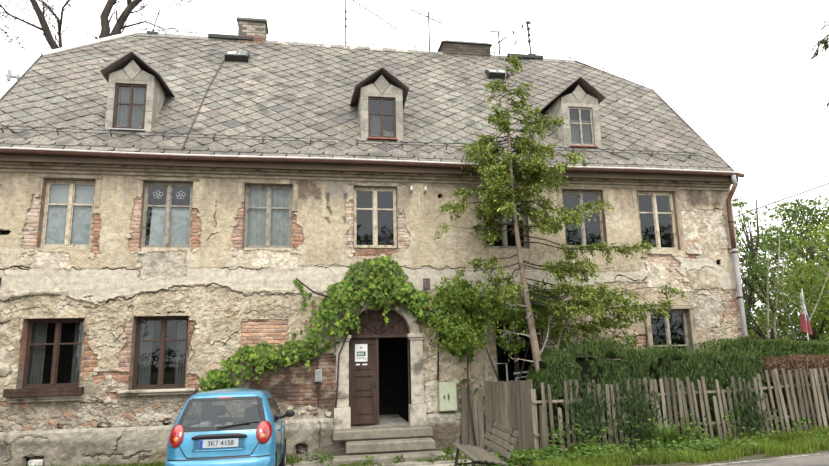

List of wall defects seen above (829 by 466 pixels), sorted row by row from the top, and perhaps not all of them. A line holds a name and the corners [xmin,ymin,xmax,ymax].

flaking render [0,195,72,270]
flaking render [88,214,101,259]
flaking render [124,196,202,279]
flaking render [229,202,304,270]
flaking render [345,200,399,257]
flaking render [641,208,738,331]
crack [0,293,41,325]
crack [66,266,294,361]
flaking render [0,290,201,432]
flaking render [246,353,336,419]